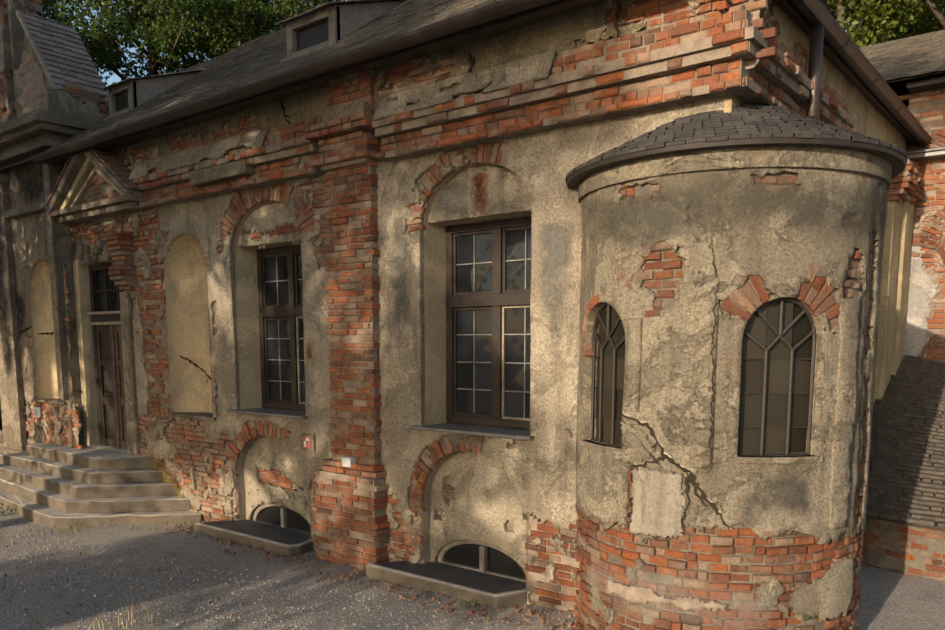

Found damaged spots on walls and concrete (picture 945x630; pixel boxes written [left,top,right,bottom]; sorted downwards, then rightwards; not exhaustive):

spalling [17,50,48,114]
spalling [375,48,457,100]
spalling [601,0,778,69]
spalling [115,111,270,170]
spalling [404,141,509,235]
spalling [637,241,687,318]
spalling [910,148,945,362]
spalling [24,262,84,449]
spalling [122,208,292,522]
crack [619,231,732,532]
spalling [522,445,866,630]